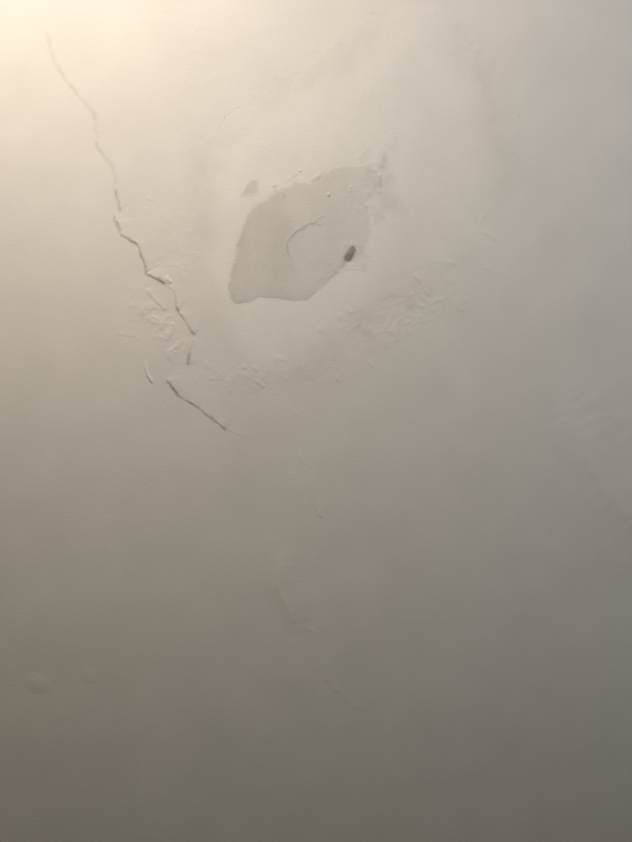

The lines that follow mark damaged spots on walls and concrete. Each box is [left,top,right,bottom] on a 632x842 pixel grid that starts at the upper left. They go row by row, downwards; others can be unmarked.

spalling [228,130,409,304]